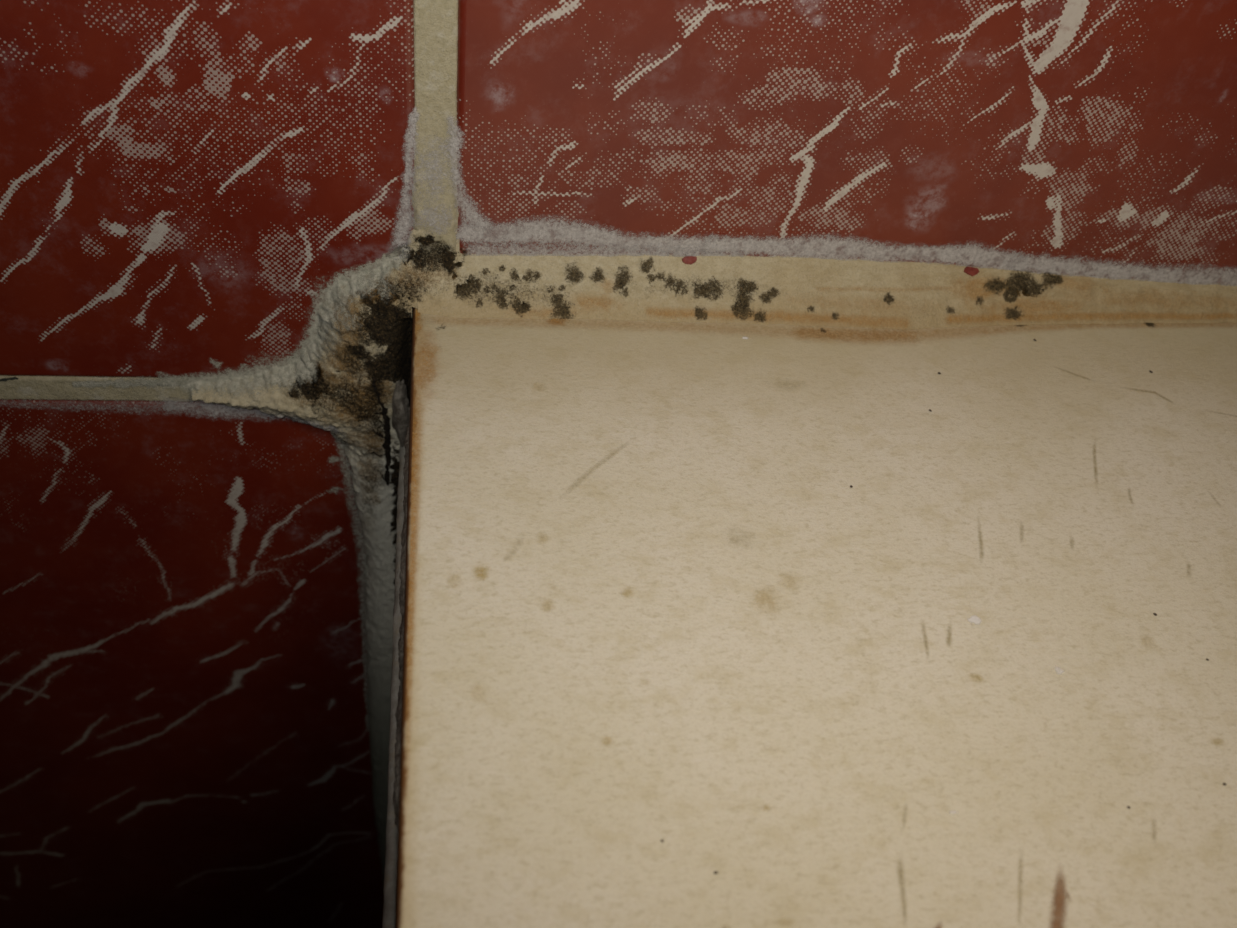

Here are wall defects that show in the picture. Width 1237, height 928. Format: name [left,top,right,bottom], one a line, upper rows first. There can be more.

damp [287,234,779,681]
damp [946,271,1063,326]